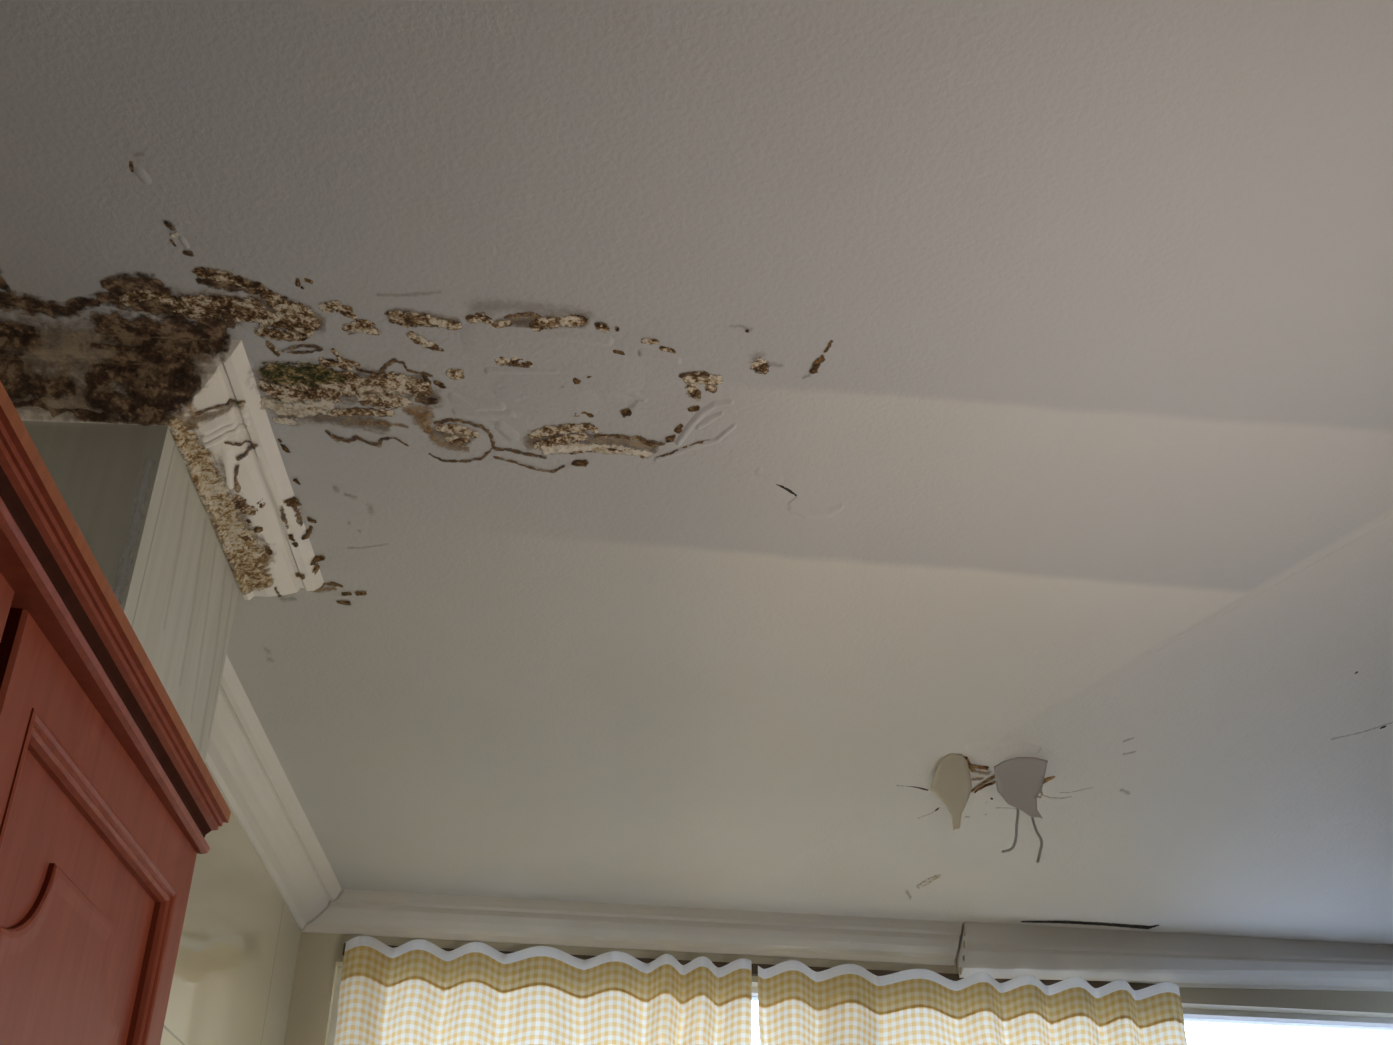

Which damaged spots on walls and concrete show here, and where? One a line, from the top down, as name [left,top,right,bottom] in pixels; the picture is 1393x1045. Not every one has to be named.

peeling [119,220,619,368]
damp [0,271,235,426]
spalling [433,368,465,389]
peeling [641,338,676,354]
spalling [679,371,723,412]
spalling [750,357,769,374]
spalling [809,340,833,374]
peeling [168,399,317,595]
spalling [295,555,325,580]
peeling [931,739,1055,831]